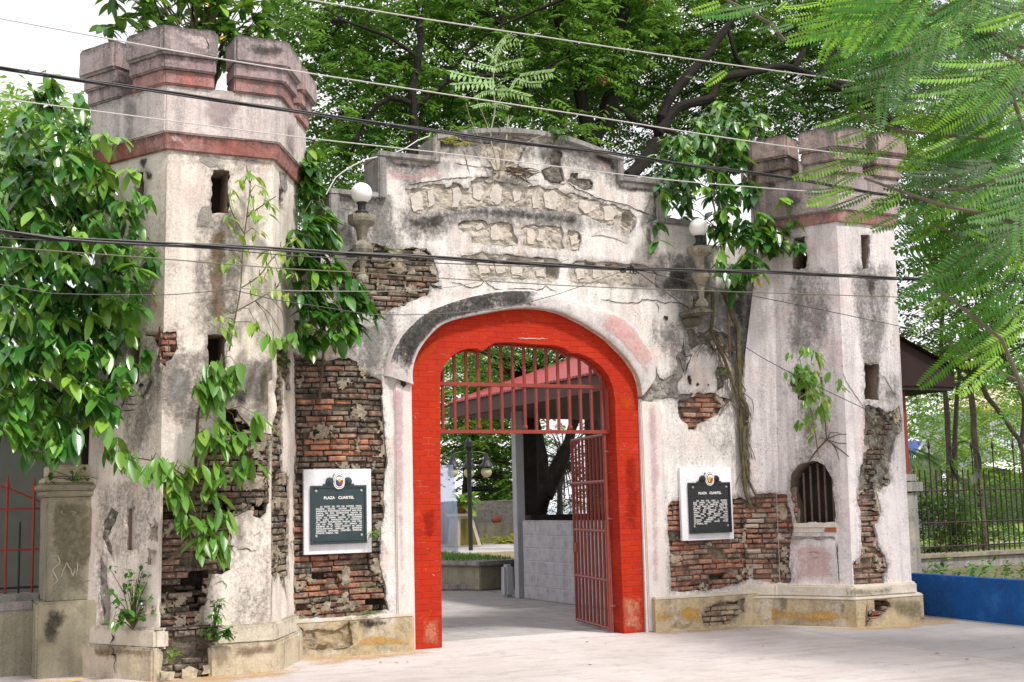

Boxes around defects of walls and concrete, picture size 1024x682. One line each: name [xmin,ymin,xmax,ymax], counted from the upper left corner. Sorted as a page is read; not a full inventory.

flaking render [405,138,656,287]
flaking render [339,244,441,316]
flaking render [148,326,178,370]
flaking render [621,326,736,430]
flaking render [144,349,388,681]
flaking render [667,487,835,592]
flaking render [853,399,901,584]
flaking render [672,598,743,629]